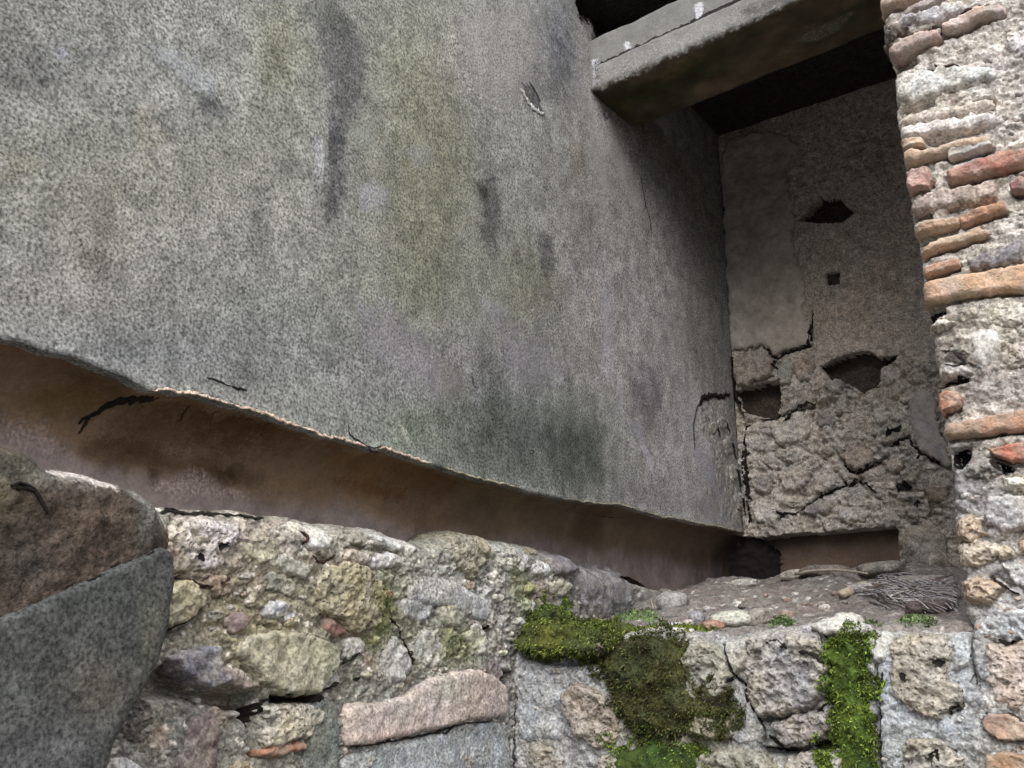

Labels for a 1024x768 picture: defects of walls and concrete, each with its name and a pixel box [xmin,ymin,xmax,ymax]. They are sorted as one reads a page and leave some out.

spalling [520,79,544,116]
damp [316,139,325,173]
crack [208,377,248,391]
crack [78,395,159,434]
crack [782,400,817,421]
crack [772,436,942,518]